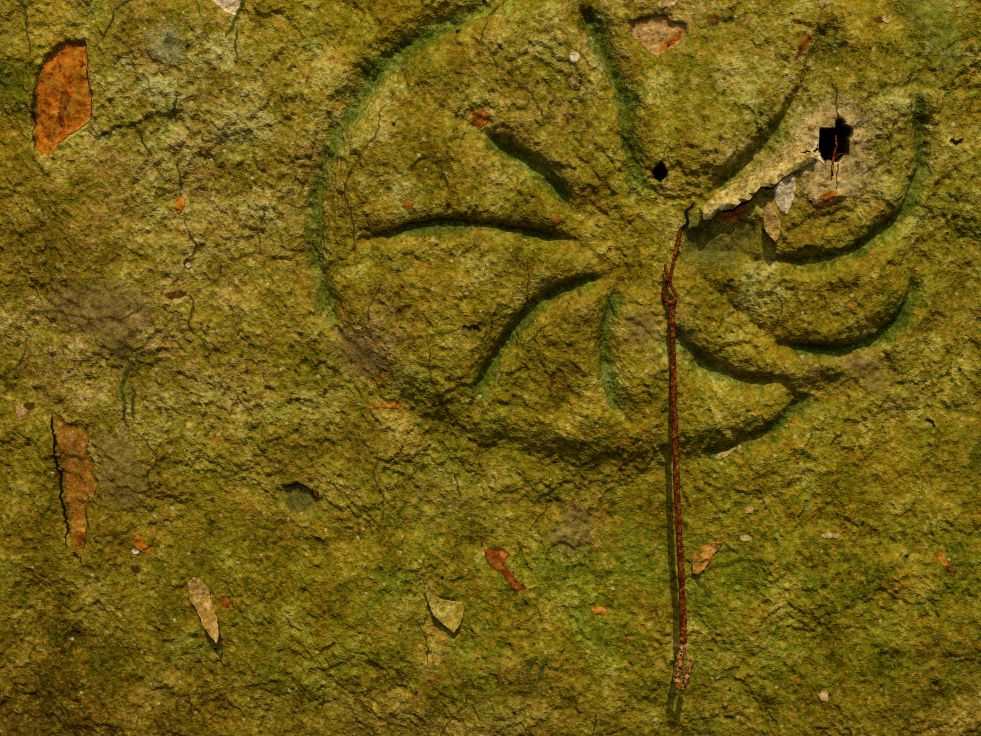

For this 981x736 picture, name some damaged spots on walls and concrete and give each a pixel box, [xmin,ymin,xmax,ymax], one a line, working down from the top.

spalling [212,0,241,15]
spalling [631,0,686,56]
spalling [30,42,92,155]
crack [87,113,155,154]
flaking render [701,89,877,242]
crack [830,78,901,191]
crack [910,98,964,144]
crack [675,179,781,247]
crack [176,157,266,354]
crack [24,301,152,320]
spalling [56,417,98,549]
spalling [481,544,525,591]